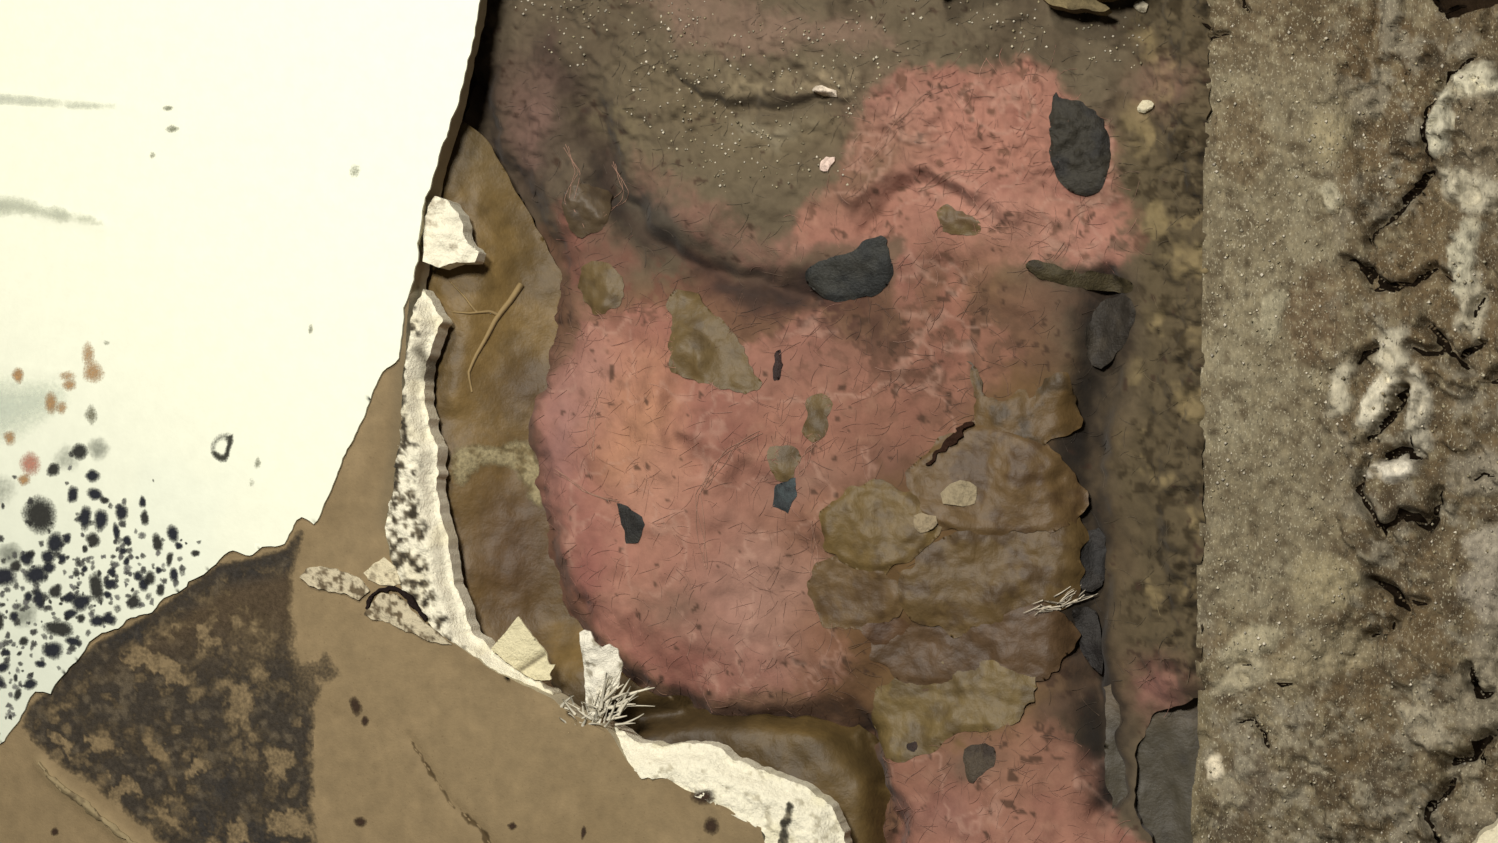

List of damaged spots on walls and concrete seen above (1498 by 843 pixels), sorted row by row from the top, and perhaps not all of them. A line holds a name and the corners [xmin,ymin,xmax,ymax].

spalling [422,196,486,270]
crack [1349,57,1498,537]
spalling [385,289,562,695]
mould [0,444,333,843]
crack [1371,581,1428,638]
mould [350,698,368,725]
mould [693,791,717,833]
spalling [614,725,853,843]
spalling [1472,819,1498,843]